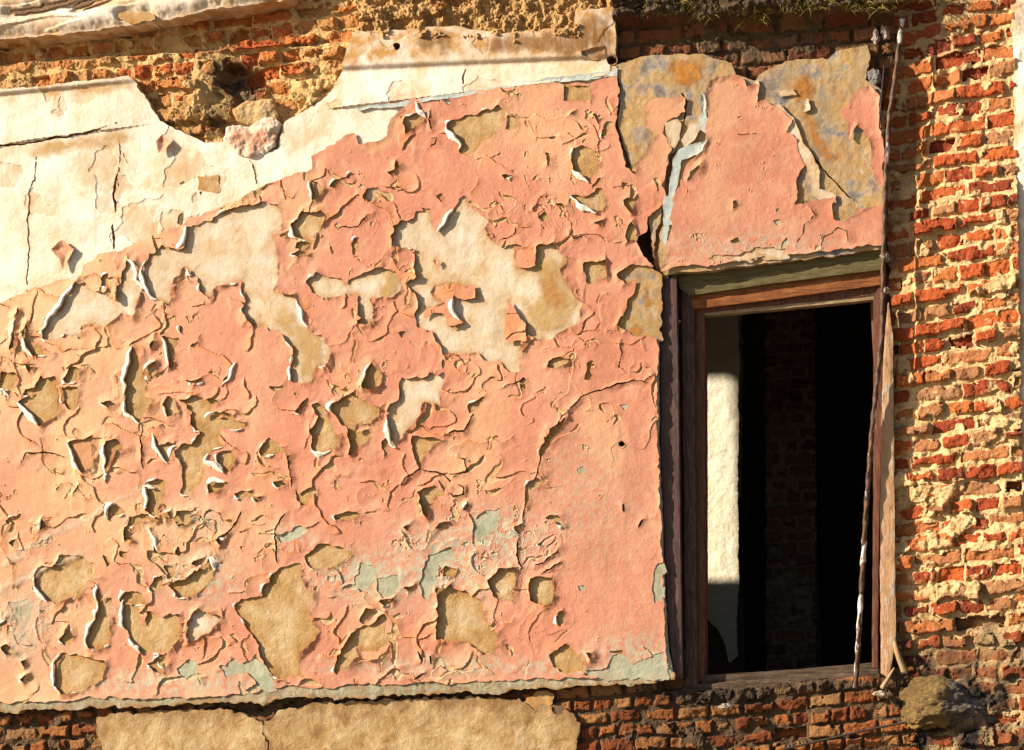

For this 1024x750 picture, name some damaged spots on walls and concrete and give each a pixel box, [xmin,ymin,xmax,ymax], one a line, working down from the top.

spalling [0,0,359,158]
crack [0,114,133,294]
crack [725,128,865,252]
peeling [0,168,663,471]
spalling [355,0,1024,750]
peeling [0,320,571,698]
spalling [0,655,913,750]